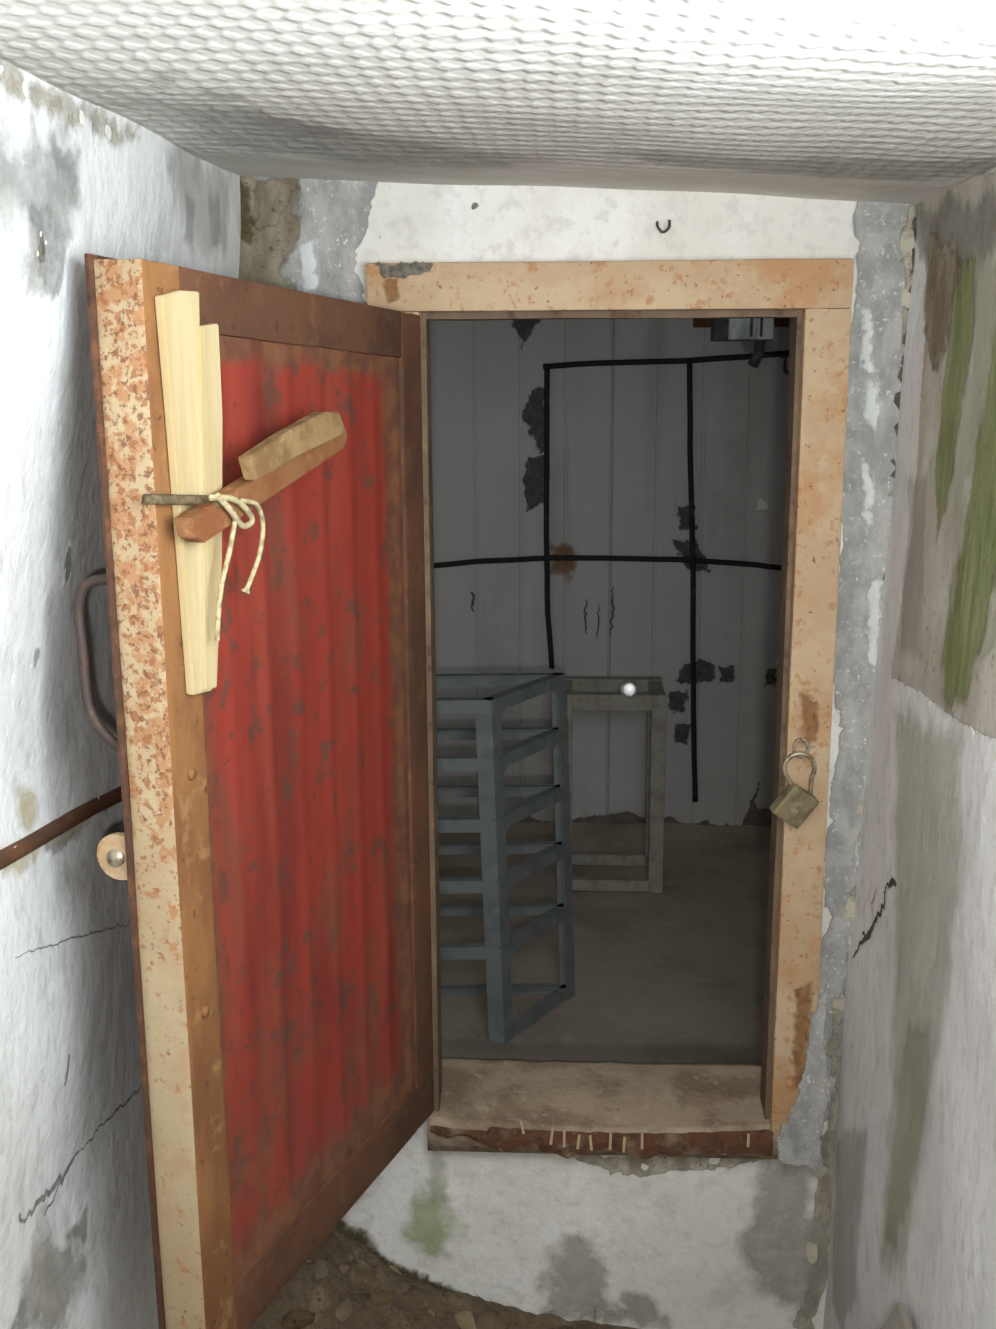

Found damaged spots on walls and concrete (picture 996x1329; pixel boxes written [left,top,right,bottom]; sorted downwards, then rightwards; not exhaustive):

damp [0,142,77,297]
peeling [239,176,377,304]
peeling [512,320,540,348]
damp [924,232,976,532]
peeling [522,387,550,512]
peeling [793,169,996,1329]
crack [853,876,897,958]
crack [20,1084,142,1223]
damp [12,1209,87,1329]
damp [544,1238,667,1326]
damp [744,1164,825,1310]